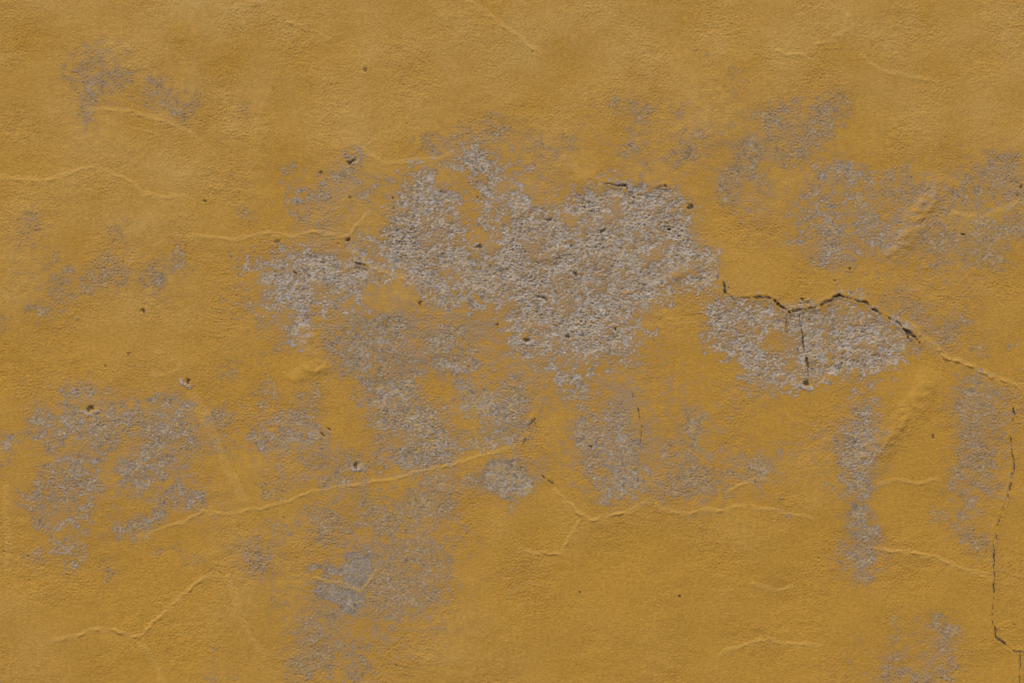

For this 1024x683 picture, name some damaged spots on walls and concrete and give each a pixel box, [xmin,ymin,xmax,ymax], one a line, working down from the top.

peeling [720,88,1024,273]
peeling [0,99,940,683]
crack [718,282,1024,683]